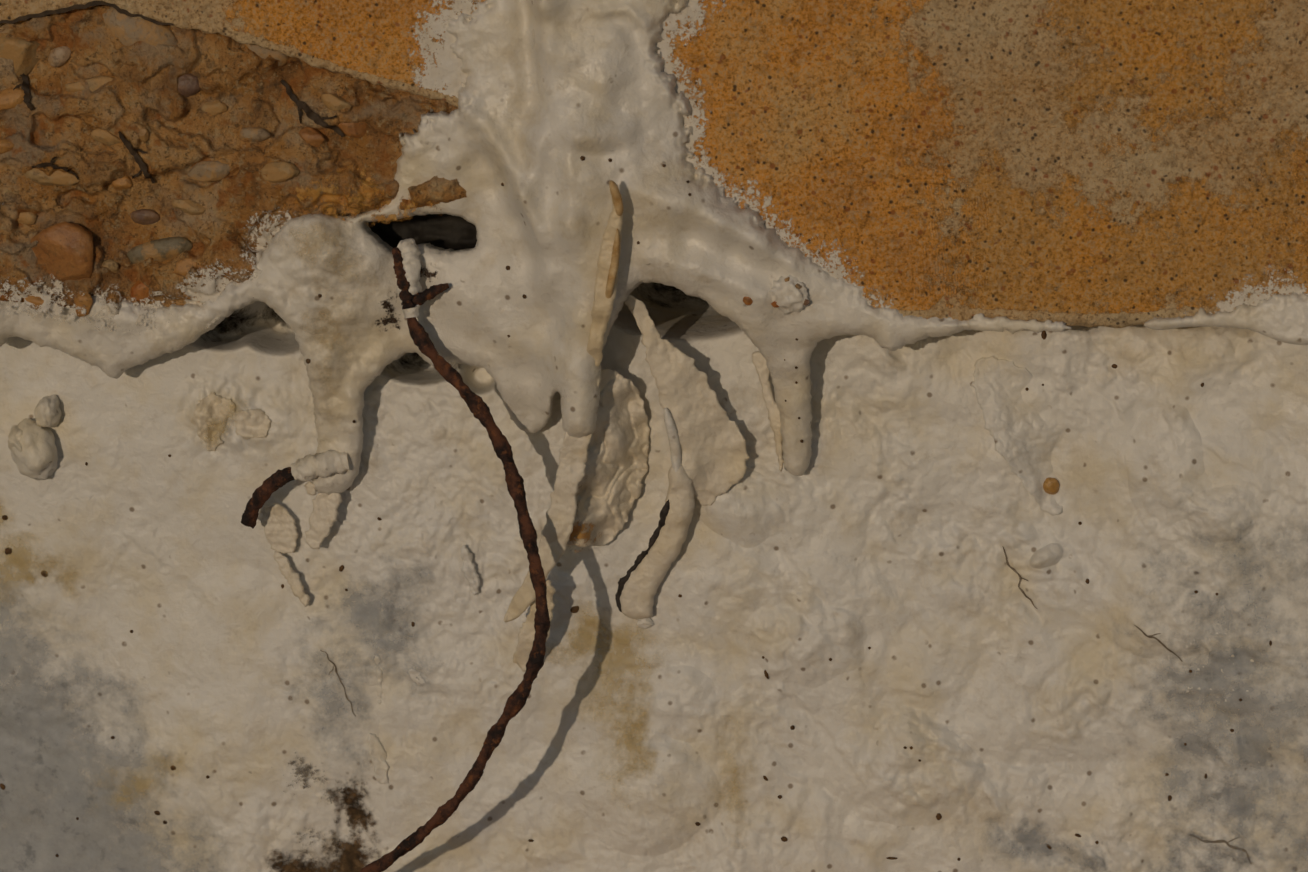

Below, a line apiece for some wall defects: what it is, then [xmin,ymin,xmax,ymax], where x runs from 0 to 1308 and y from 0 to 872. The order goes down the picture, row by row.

spalling [0,5,467,317]
leakage [0,586,171,872]